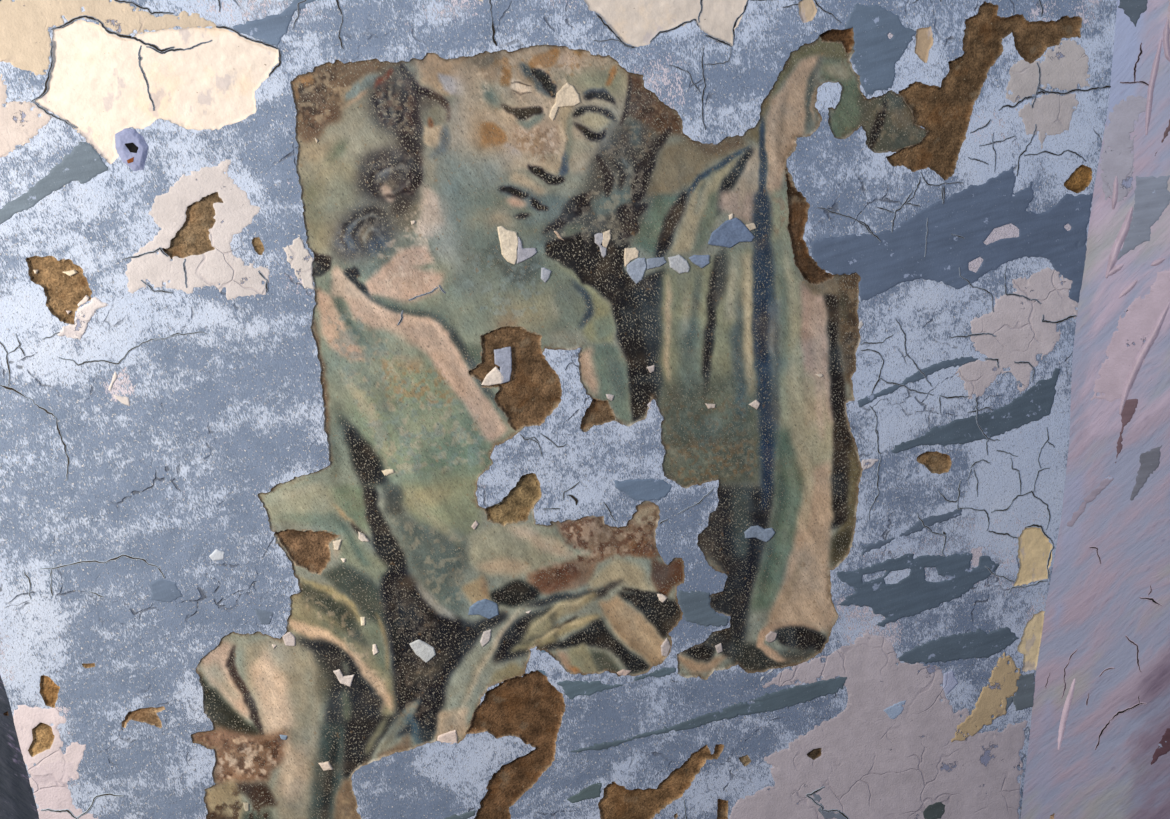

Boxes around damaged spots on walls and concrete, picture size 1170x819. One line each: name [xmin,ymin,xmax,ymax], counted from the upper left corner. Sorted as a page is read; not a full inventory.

peeling [0,0,279,164]
crack [817,43,1149,257]
spalling [886,1,1090,181]
crack [0,331,207,481]
crack [121,247,187,293]
peeling [125,159,270,300]
crack [258,270,268,293]
spalling [468,325,562,431]
crack [861,319,1055,593]
crack [949,265,1076,382]
spalling [465,670,565,819]
peeling [717,632,1028,819]